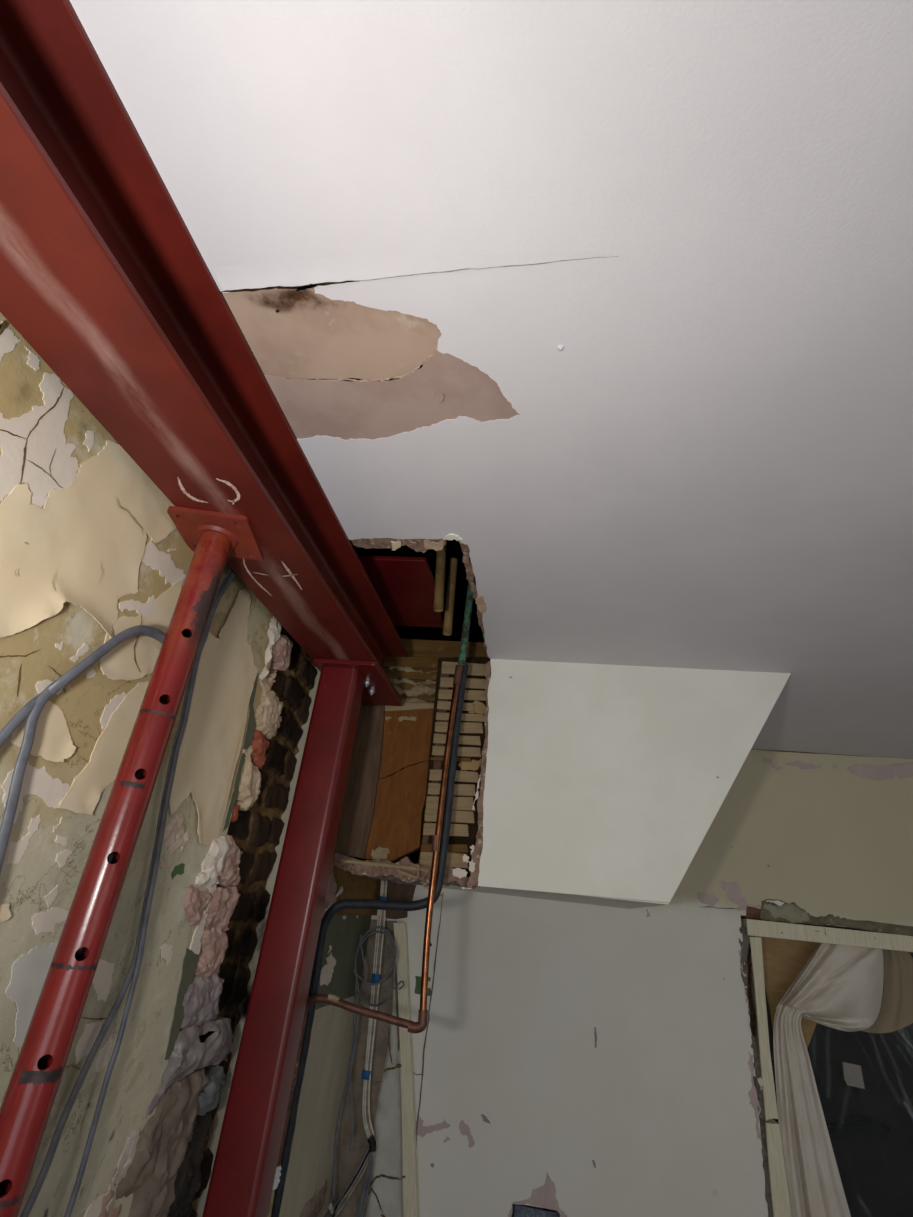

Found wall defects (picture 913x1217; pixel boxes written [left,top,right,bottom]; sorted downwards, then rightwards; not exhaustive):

crack [213,251,617,293]
crack [0,320,9,335]
peeling [221,287,520,440]
crack [0,388,63,488]
peeling [0,321,186,867]
peeling [0,903,11,922]
peeling [84,588,293,1217]
peeling [5,885,69,1047]
peeling [75,1019,113,1072]
peeling [508,1173,567,1217]